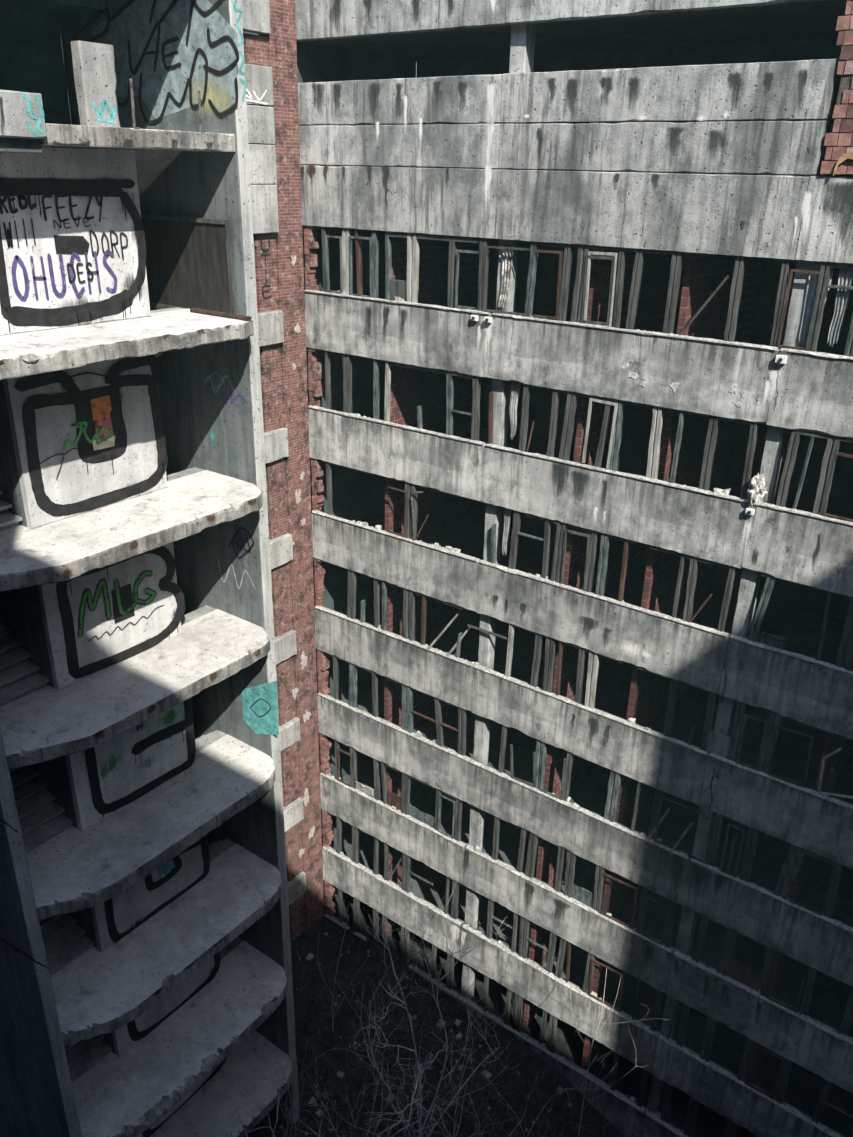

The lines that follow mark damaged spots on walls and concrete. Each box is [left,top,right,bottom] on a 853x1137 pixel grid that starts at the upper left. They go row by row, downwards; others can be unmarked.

leakage [313,84,340,108]
leakage [370,83,380,137]
leakage [396,83,423,145]
leakage [549,78,577,114]
leakage [601,77,612,99]
leakage [627,77,639,105]
leakage [723,72,741,118]
leakage [484,84,498,210]
leakage [669,127,684,149]
leakage [697,115,725,156]
leakage [552,463,588,495]
leakage [741,522,758,562]